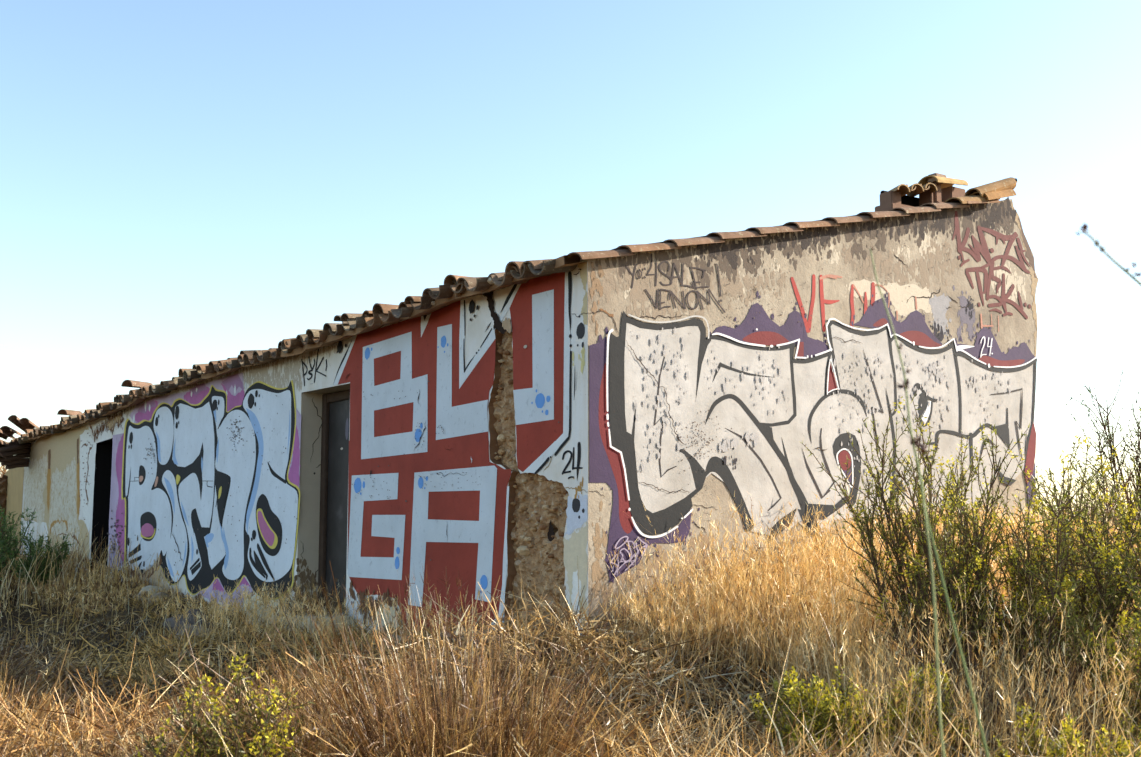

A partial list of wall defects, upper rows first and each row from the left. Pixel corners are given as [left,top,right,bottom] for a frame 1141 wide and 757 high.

crack [483,291,507,334]
water stain [591,197,1018,489]
peeling [547,492,588,617]